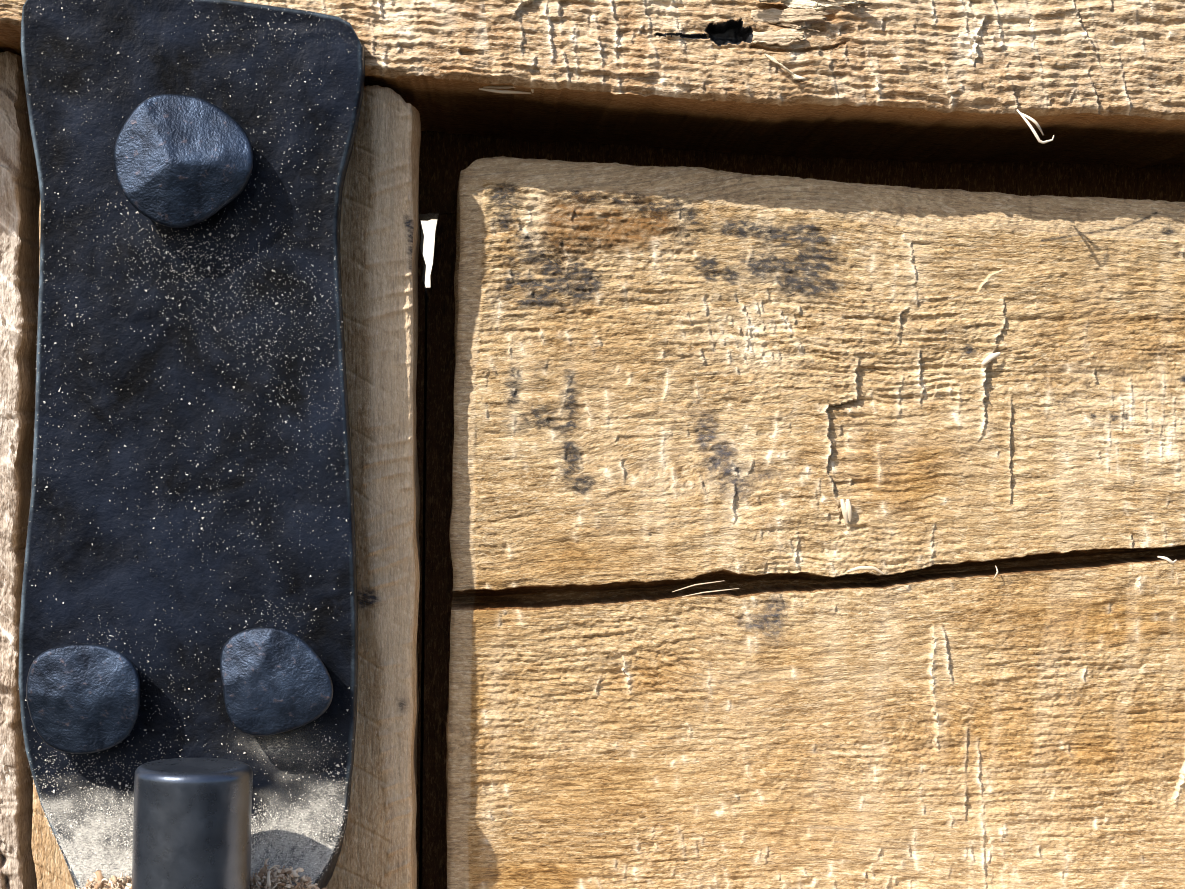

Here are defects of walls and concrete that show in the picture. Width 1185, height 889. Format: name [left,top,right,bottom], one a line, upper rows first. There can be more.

spalling [749,0,844,36]
leakage [489,185,521,230]
leakage [505,191,697,309]
leakage [694,220,838,295]
crack [451,545,1185,610]